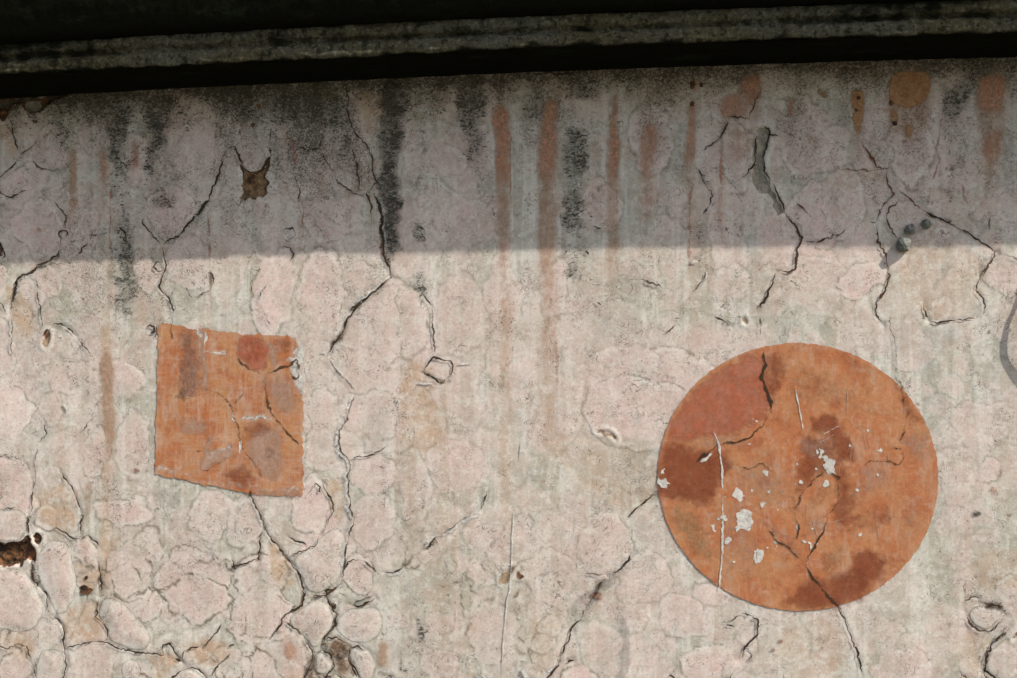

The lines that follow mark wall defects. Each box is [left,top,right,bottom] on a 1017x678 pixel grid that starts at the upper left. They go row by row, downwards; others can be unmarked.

crack [0,87,403,678]
flaking render [240,157,270,201]
rust [493,108,511,200]
water stain [0,57,1017,321]
crack [696,92,846,461]
rust [851,90,865,132]
rust [889,72,930,136]
crack [841,146,1017,465]
flaking render [0,533,42,567]
crack [547,495,652,678]
crack [769,473,863,673]
crack [959,596,1010,678]